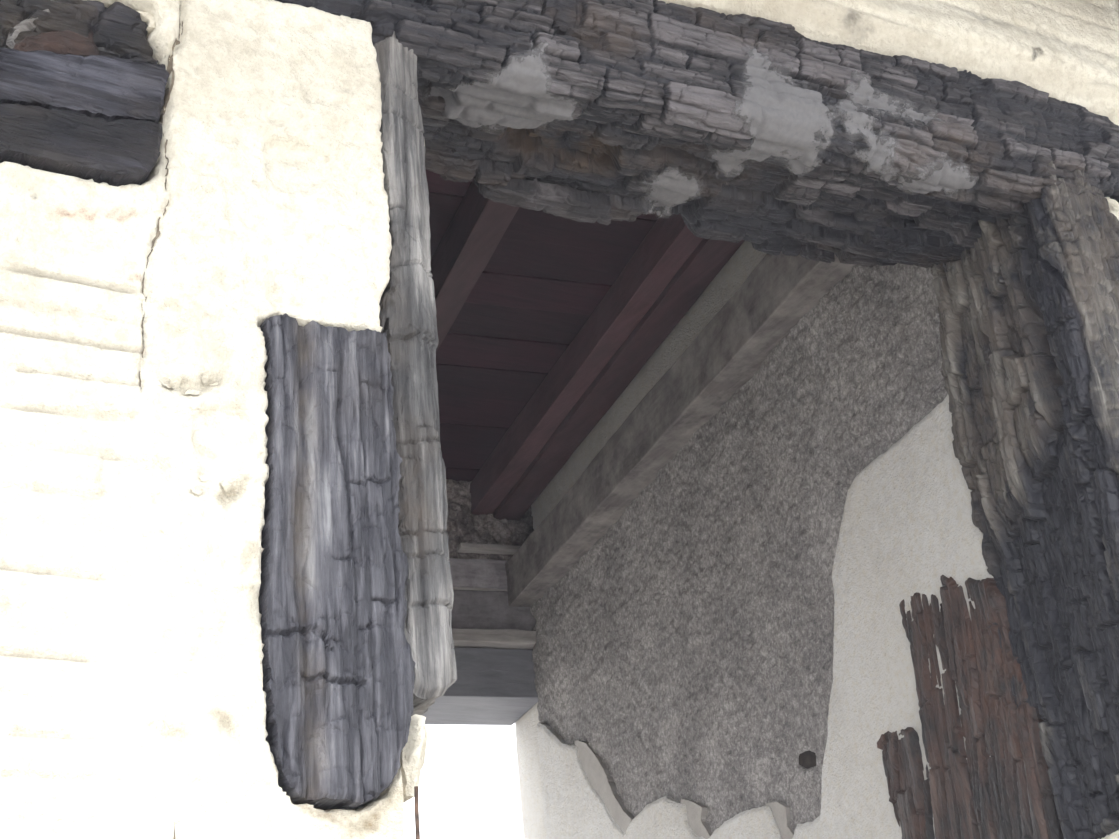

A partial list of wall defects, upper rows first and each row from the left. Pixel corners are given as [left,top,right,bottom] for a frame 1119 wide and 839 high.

crack [139,9,183,392]